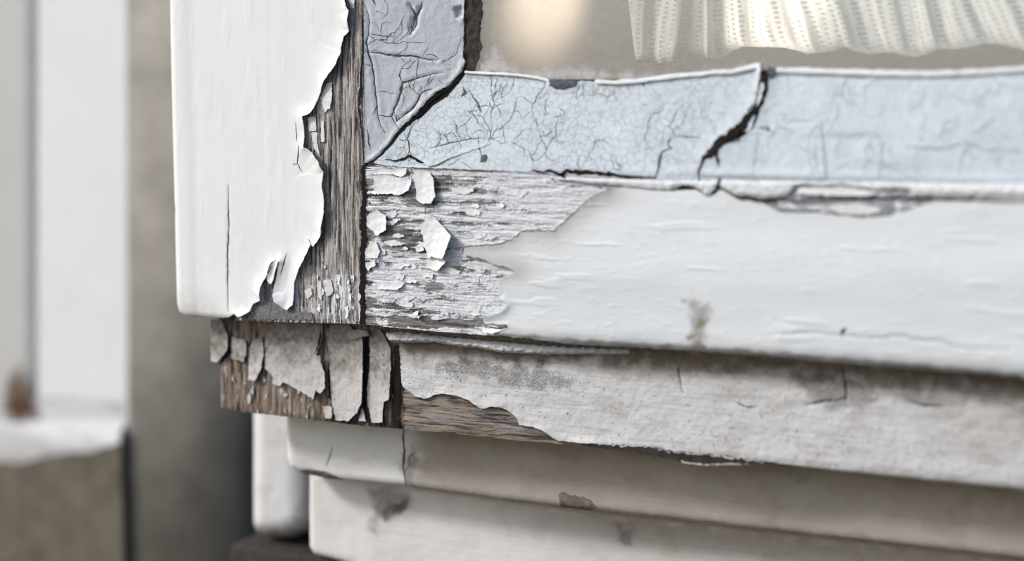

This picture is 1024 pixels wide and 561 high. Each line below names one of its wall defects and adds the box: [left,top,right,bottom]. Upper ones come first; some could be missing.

crack [224,185,232,312]
crack [315,329,331,399]
peeling [210,0,660,450]
crack [345,0,1024,486]